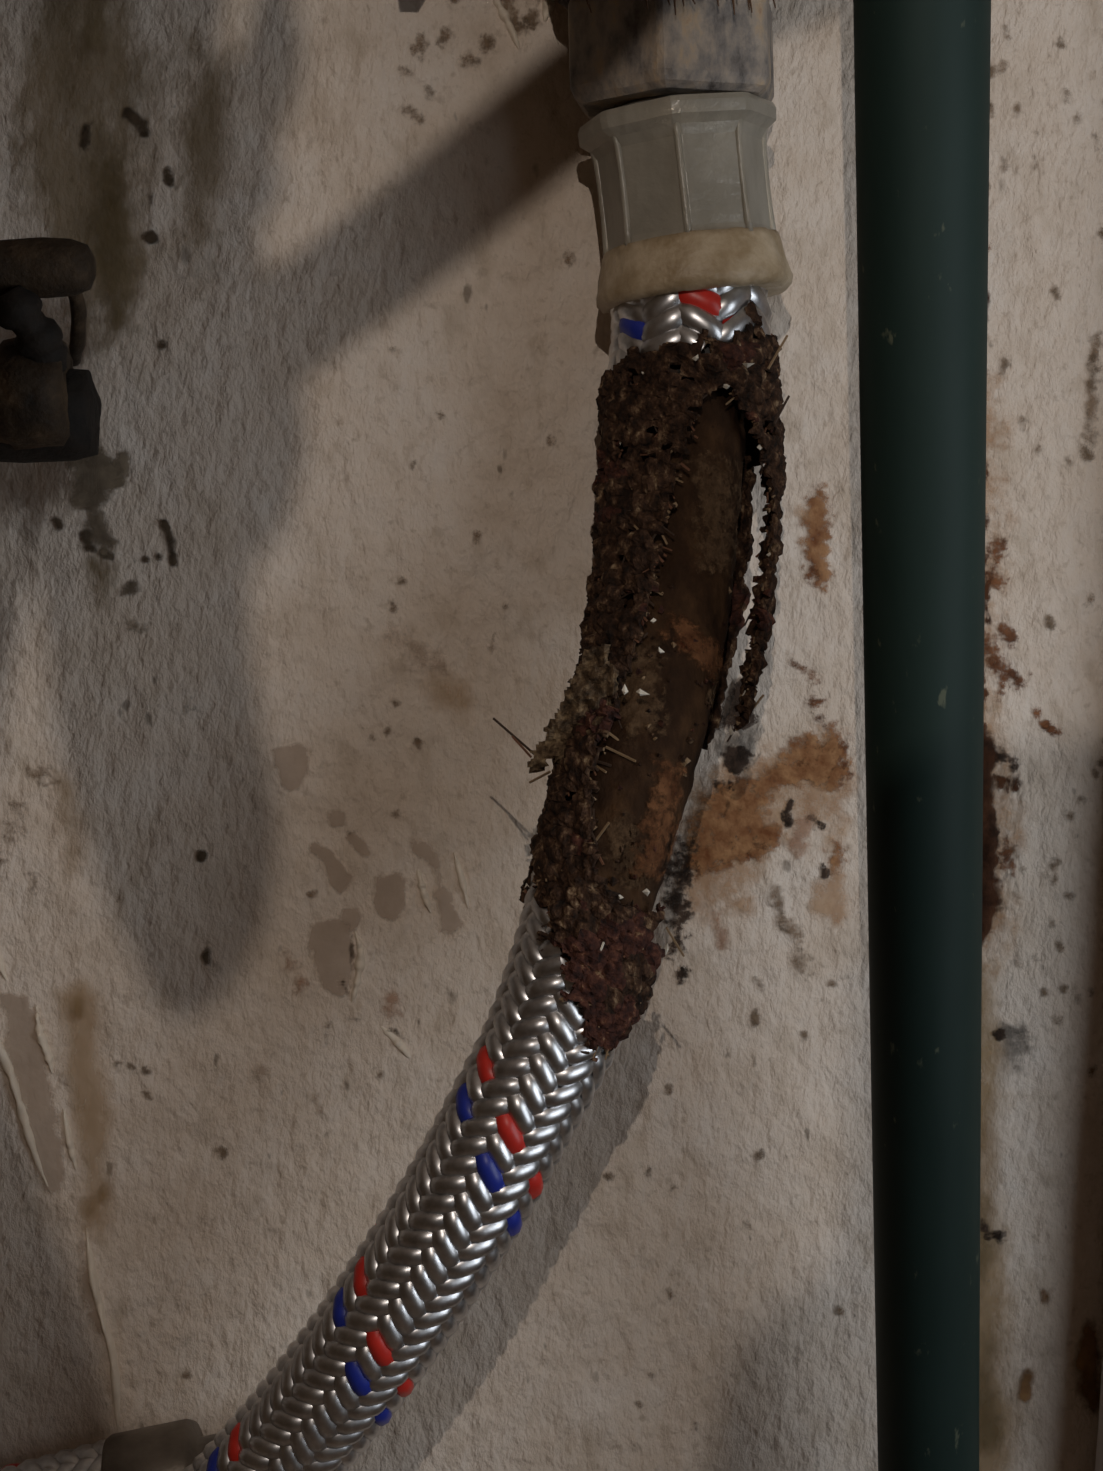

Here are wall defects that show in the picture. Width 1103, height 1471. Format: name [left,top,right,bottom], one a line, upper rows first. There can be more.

leakage [28,0,159,328]
leakage [149,167,174,201]
rust [797,483,833,593]
peeling [274,744,307,790]
rust [603,661,853,949]
rust [982,464,1031,945]
rust [1034,709,1062,736]
peeling [298,842,469,1002]